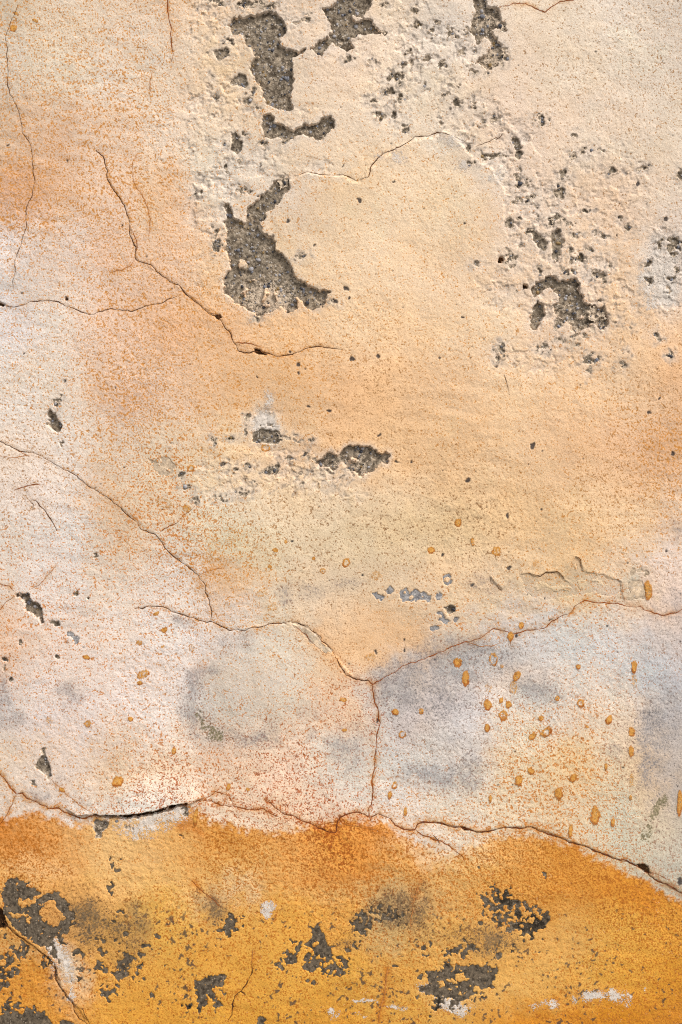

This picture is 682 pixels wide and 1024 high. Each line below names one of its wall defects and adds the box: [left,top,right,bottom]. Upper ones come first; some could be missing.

crack [5,5,338,357]
flaking render [203,0,389,323]
flaking render [410,0,509,75]
flaking render [441,85,500,124]
flaking render [466,133,635,373]
flaking render [209,413,390,502]
crack [0,441,682,893]
peeling [0,877,161,1024]
peeling [181,974,232,1013]
peeling [274,904,409,989]
peeling [416,883,550,1021]